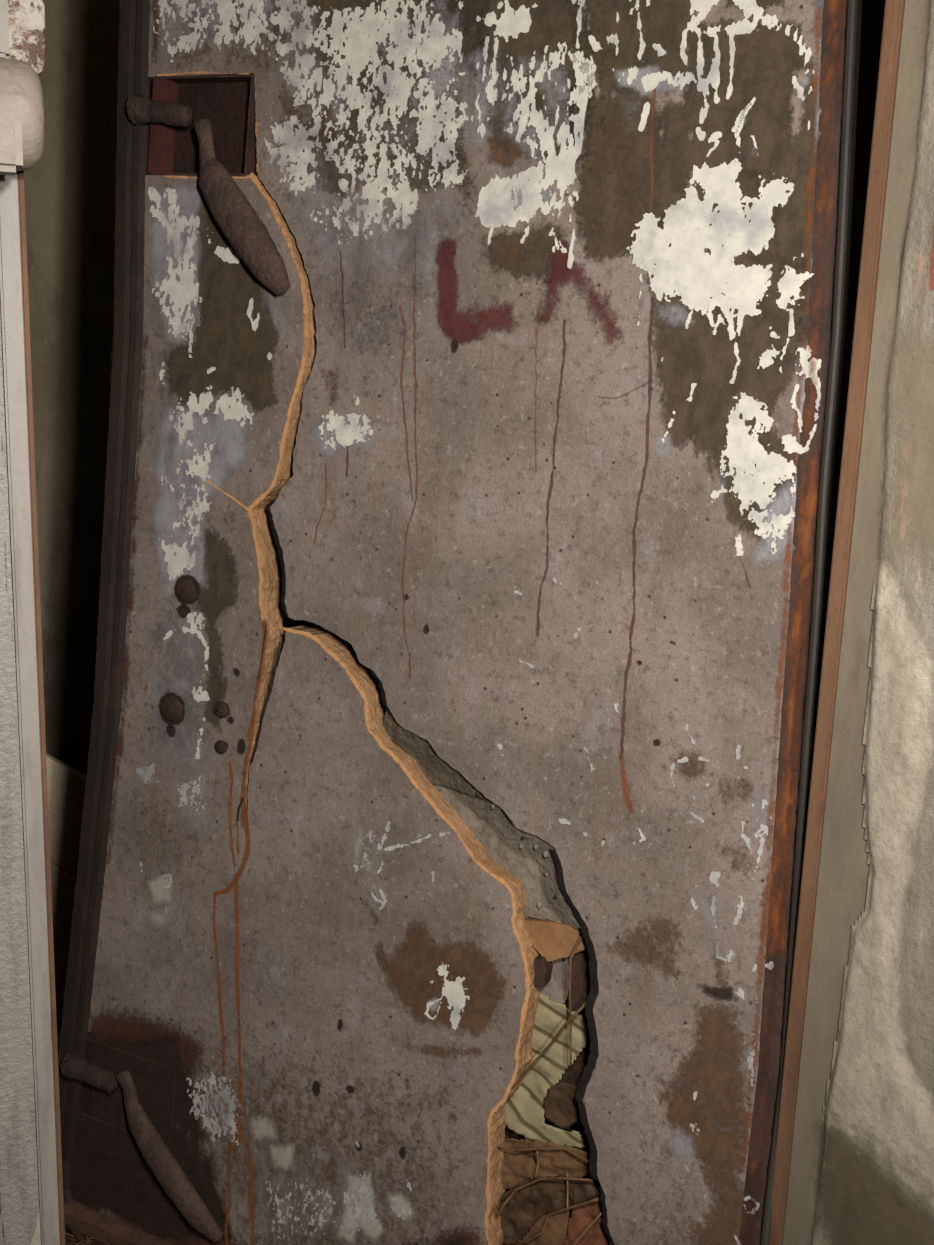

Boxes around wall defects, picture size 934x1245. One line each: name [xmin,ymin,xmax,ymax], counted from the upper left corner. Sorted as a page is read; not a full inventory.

peeling [148,186,285,777]
peeling [153,0,822,561]
corrosion [795,332,817,430]
corrosion [70,762,255,1245]
leakage [186,1072,414,1242]
crack [157,71,615,1245]
peeling [376,922,506,1056]
spalling [383,708,581,929]
leakage [670,724,710,823]
leakage [691,744,772,1003]
leakage [747,1033,755,1086]
corrosion [757,452,822,984]